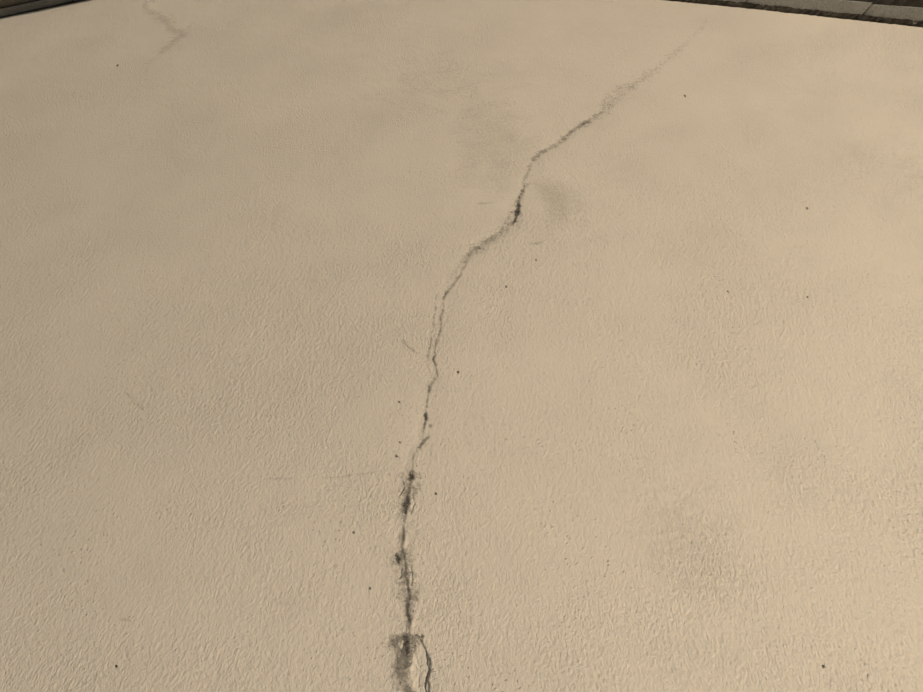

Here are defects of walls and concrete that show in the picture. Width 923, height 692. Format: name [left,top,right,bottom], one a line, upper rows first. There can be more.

crack [491,197,521,241]
crack [388,470,431,692]